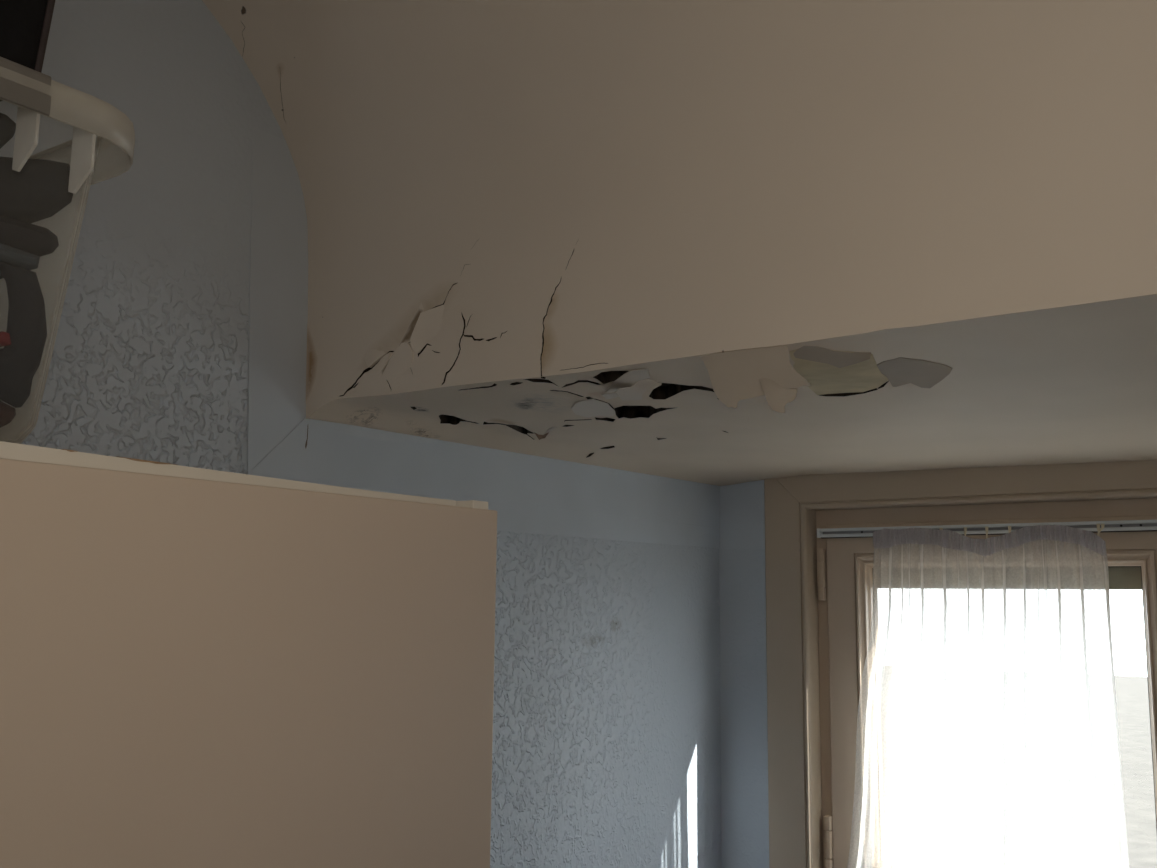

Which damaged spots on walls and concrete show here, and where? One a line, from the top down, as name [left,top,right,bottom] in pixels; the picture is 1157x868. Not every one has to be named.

crack [341,240,507,396]
crack [540,241,607,379]
flaking render [439,346,952,440]